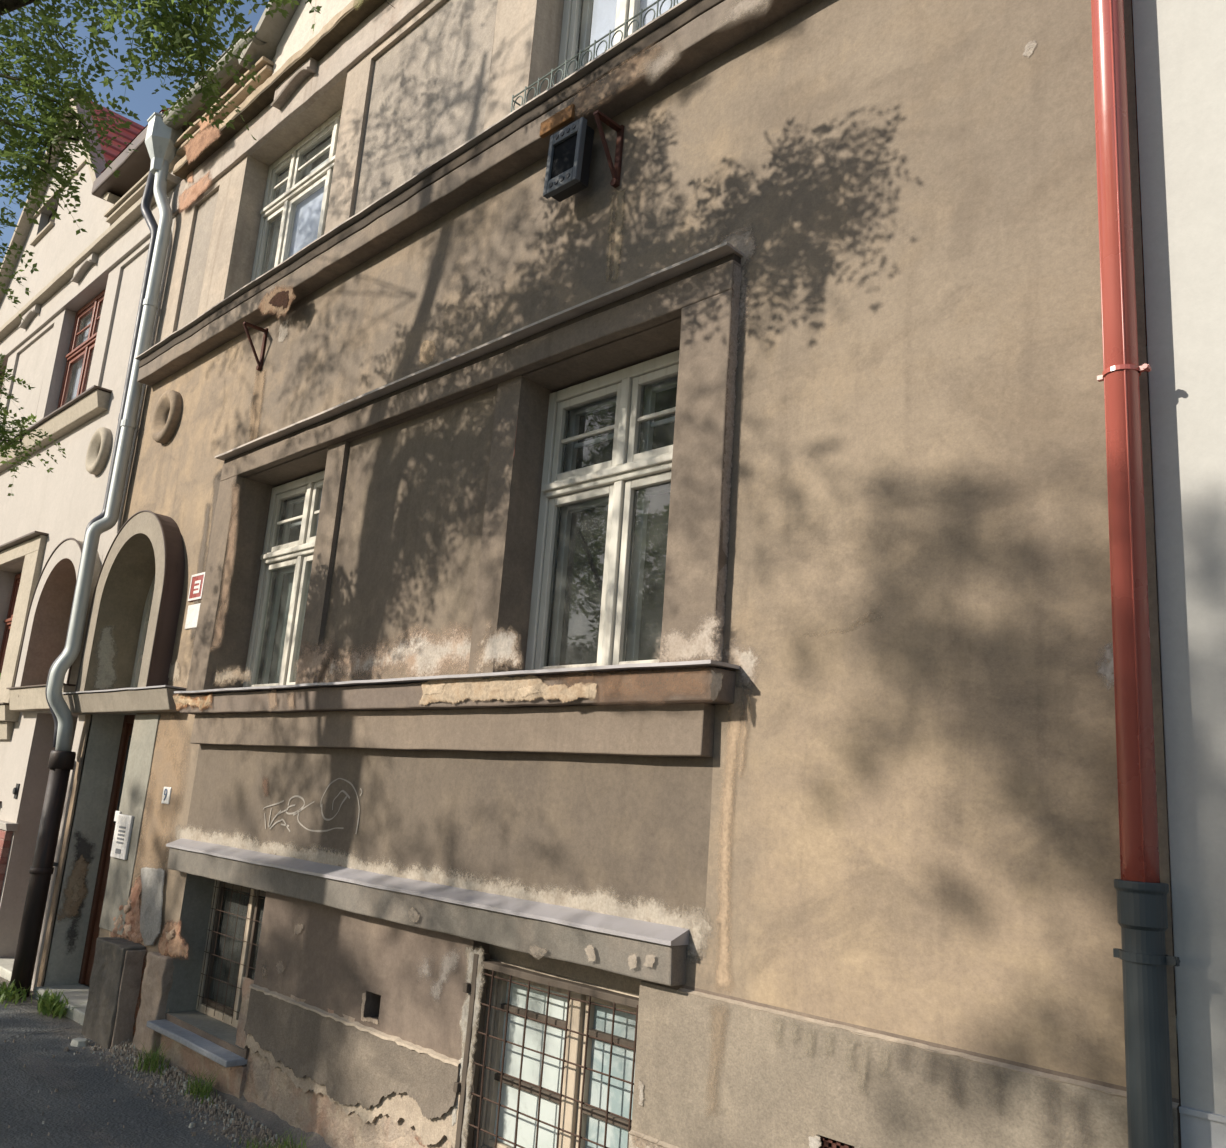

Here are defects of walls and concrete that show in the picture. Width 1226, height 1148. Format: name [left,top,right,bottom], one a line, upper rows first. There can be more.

spalling [179,116,220,211]
spalling [258,286,296,317]
spalling [419,675,597,706]
spalling [57,832,93,952]
spalling [110,877,189,1036]
spalling [244,947,484,1148]
peeling [808,1136,821,1148]